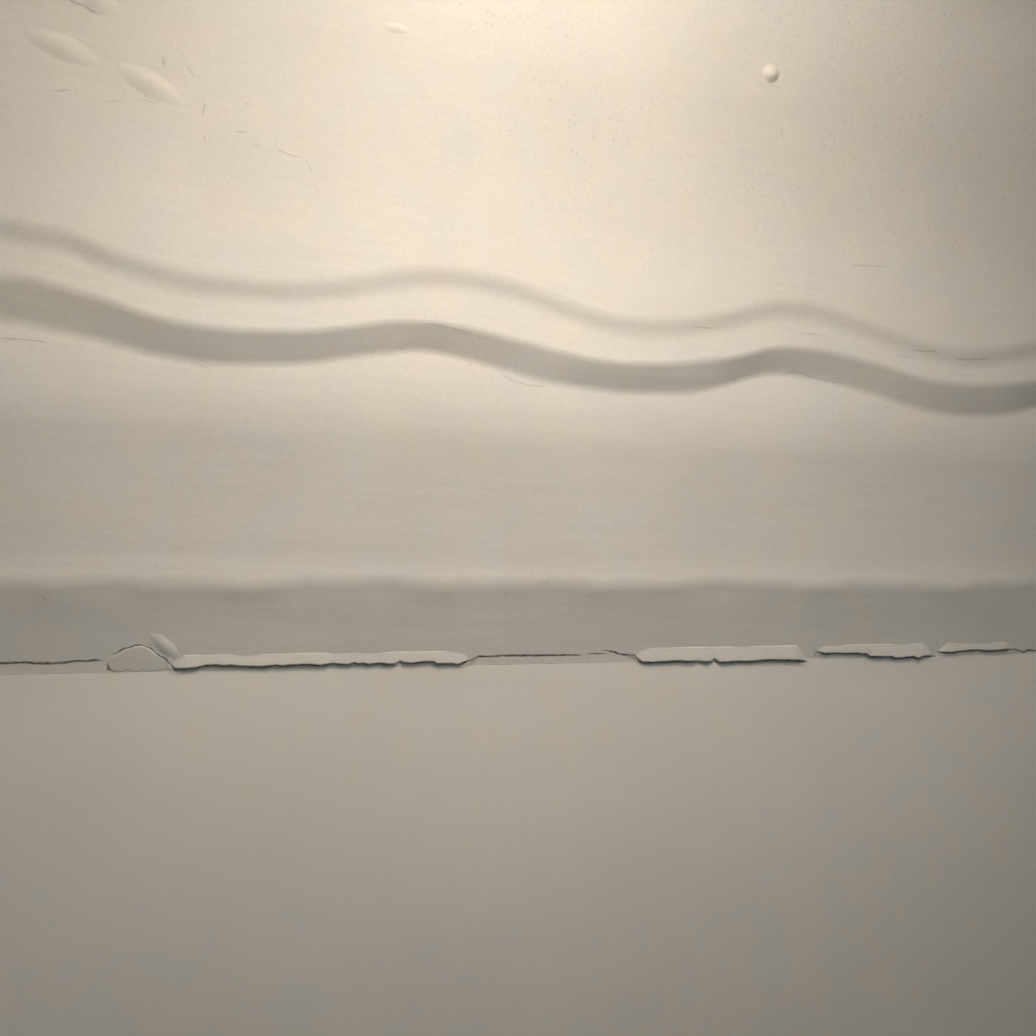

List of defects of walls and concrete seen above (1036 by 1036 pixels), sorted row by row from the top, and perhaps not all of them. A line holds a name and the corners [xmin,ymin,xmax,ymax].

crack [0,644,1035,671]